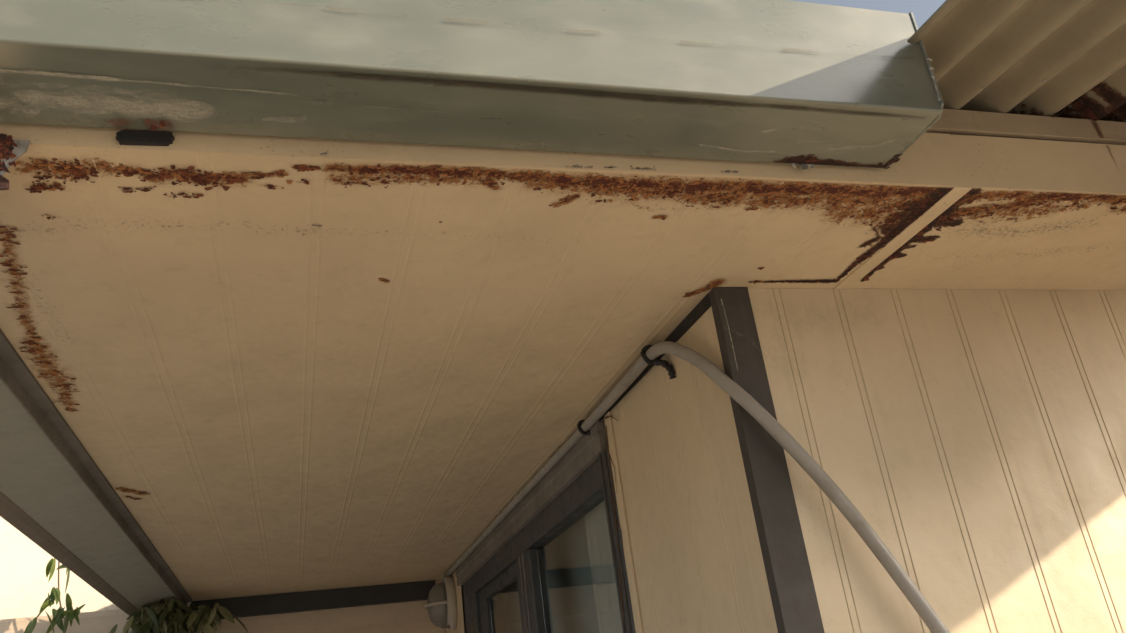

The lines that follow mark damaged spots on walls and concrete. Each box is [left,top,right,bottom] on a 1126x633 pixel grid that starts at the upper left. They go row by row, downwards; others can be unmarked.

rust [1010,82,1126,147]
rust [0,133,1126,284]
rust [0,226,81,411]